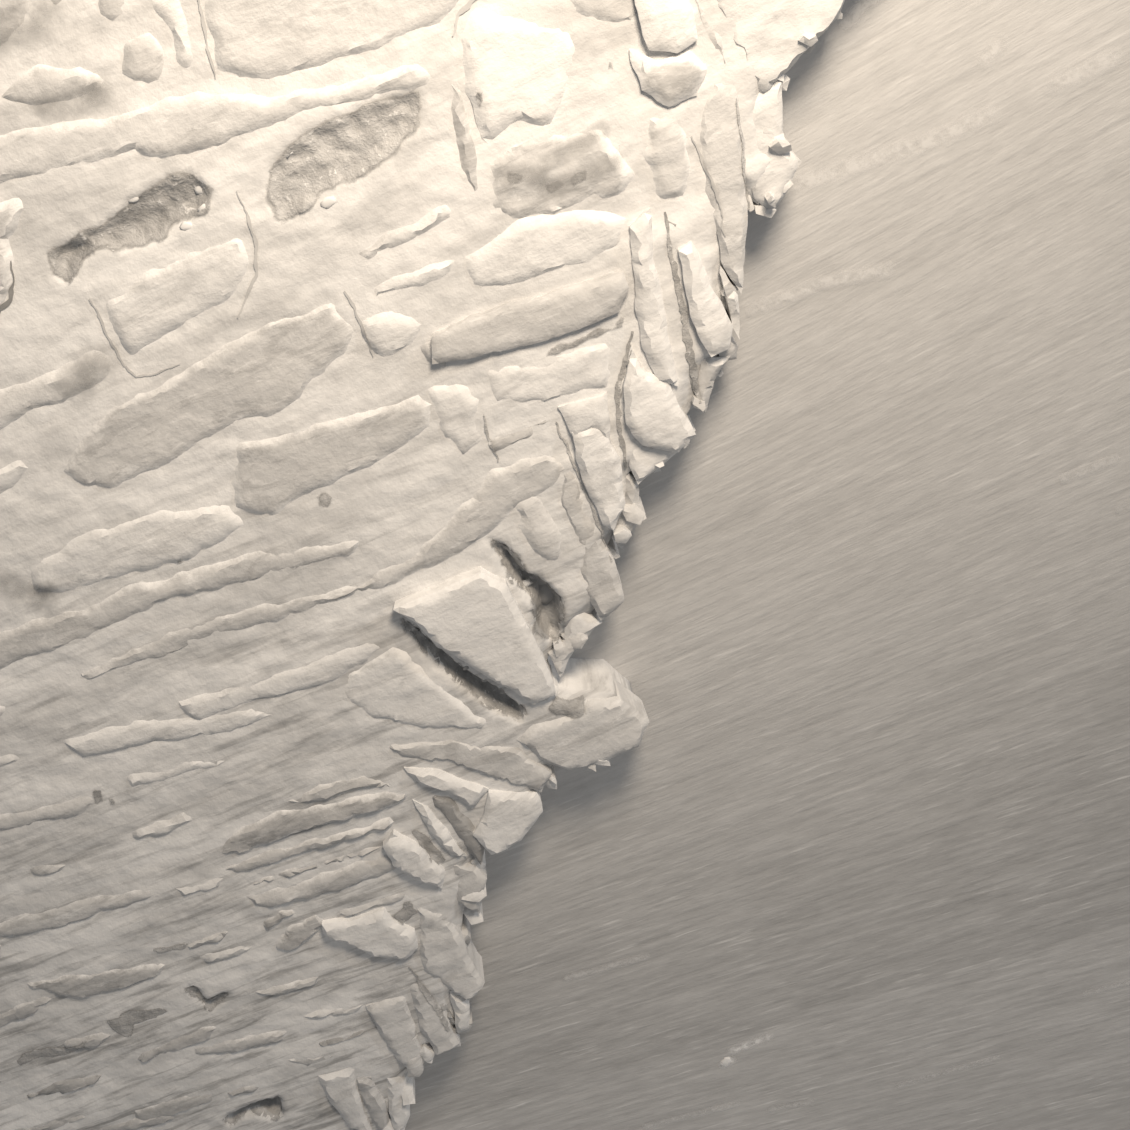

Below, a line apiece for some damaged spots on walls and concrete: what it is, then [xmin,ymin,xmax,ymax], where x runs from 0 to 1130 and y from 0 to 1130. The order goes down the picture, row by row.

spalling [267,92,420,220]
spalling [547,171,586,192]
spalling [48,173,210,283]
spalling [319,493,331,507]
spalling [491,540,565,643]
spalling [185,987,228,1011]
spalling [224,1096,282,1124]